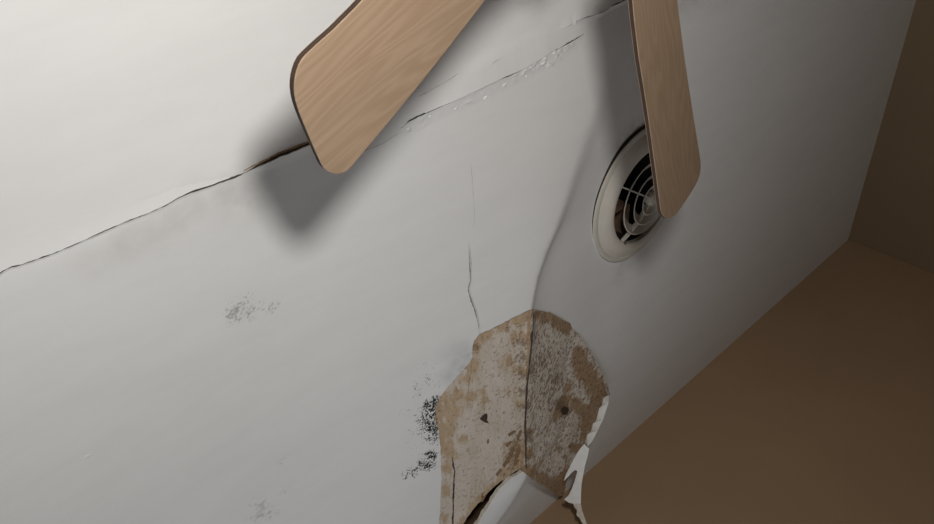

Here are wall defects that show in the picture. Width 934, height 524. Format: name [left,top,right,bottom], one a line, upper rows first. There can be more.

crack [363,0,628,153]
crack [0,141,314,277]
crack [468,171,481,334]
spalling [614,199,630,235]
water stain [402,377,439,479]
spalling [435,309,610,524]